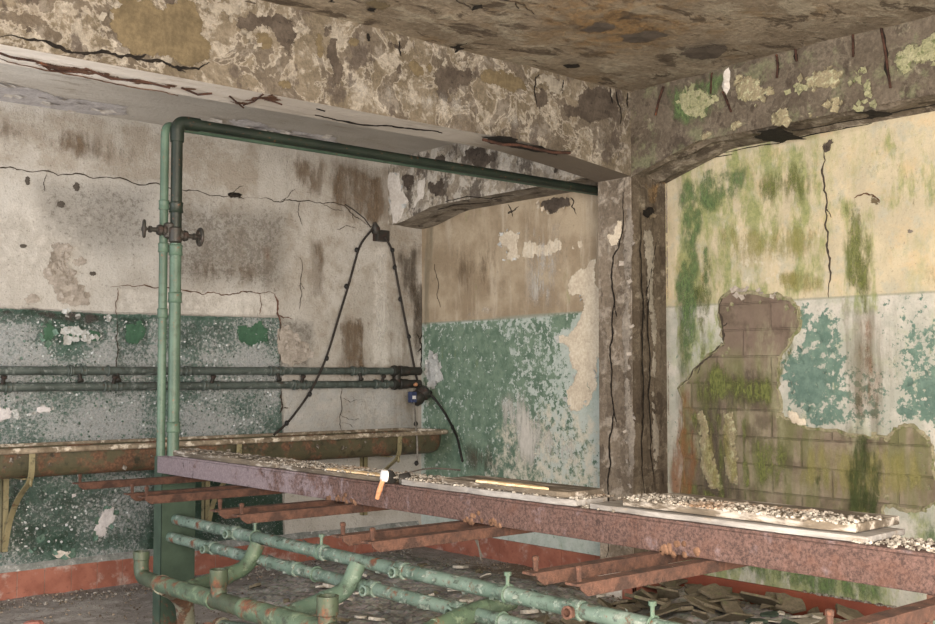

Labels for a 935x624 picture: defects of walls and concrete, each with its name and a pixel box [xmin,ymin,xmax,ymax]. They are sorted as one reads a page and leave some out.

crack [0,34,210,96]
crack [0,166,367,230]
crack [717,104,935,298]
peeling [0,308,169,443]
crack [112,258,303,367]
peeling [179,322,279,437]
peeling [424,350,443,389]
peeling [554,259,599,412]
crack [607,199,664,502]
damp [676,261,703,358]
peeling [896,405,919,418]
peeling [0,465,148,560]